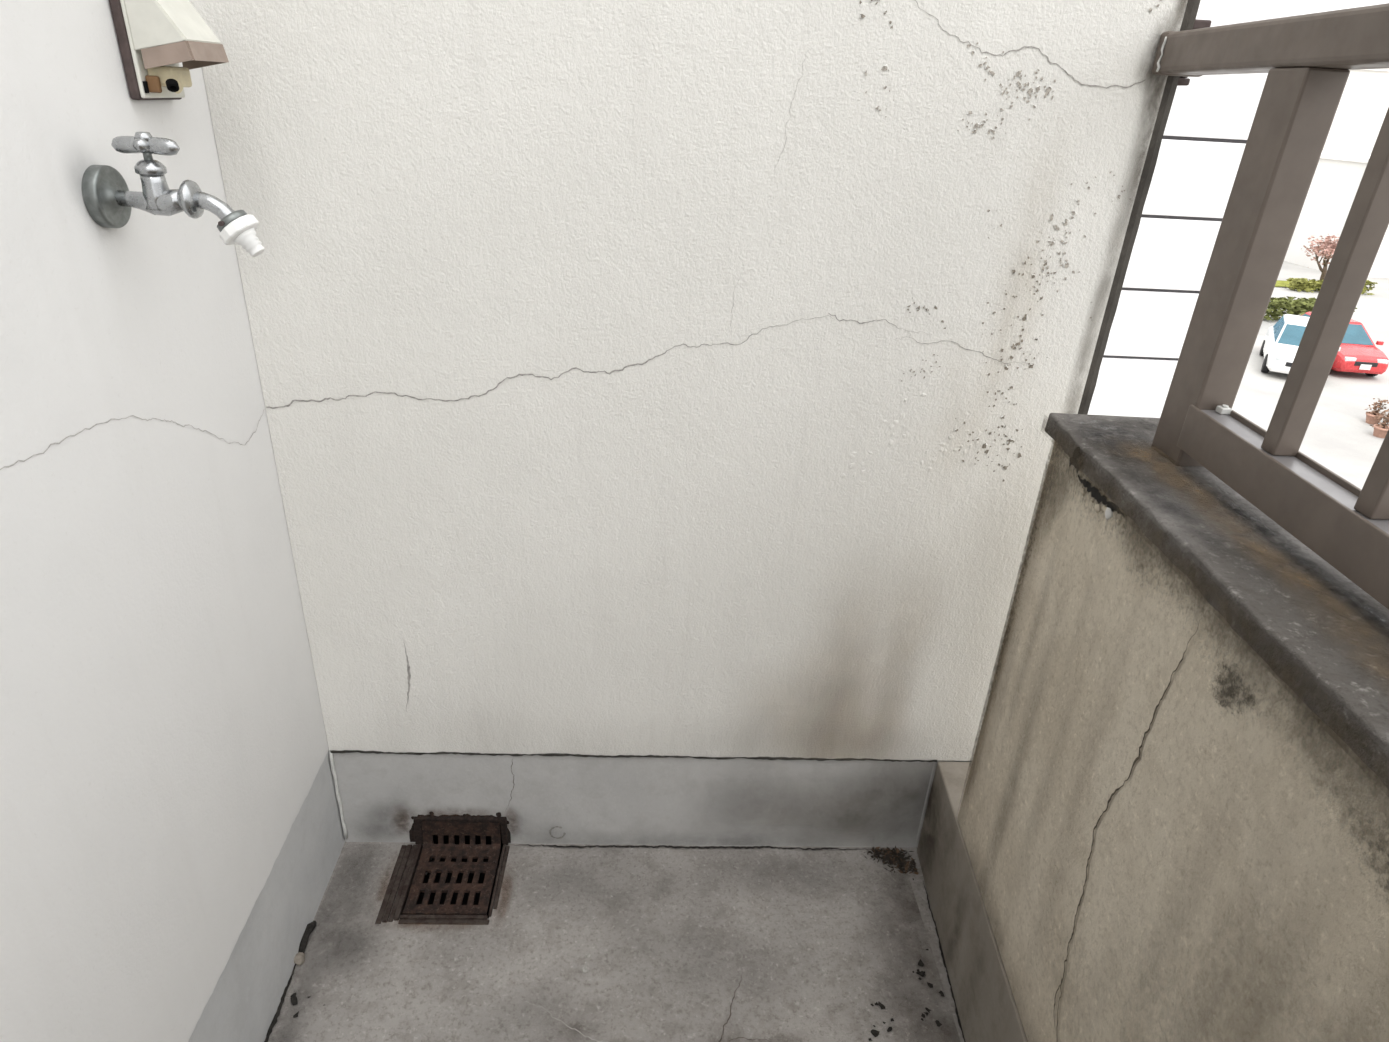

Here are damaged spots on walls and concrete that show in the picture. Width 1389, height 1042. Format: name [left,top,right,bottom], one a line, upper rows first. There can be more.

crack [915,0,1145,89]
crack [0,272,1034,470]
damp [1214,664,1256,713]
corrosion [400,811,511,843]
crack [1054,624,1199,1026]
crack [719,972,771,1042]